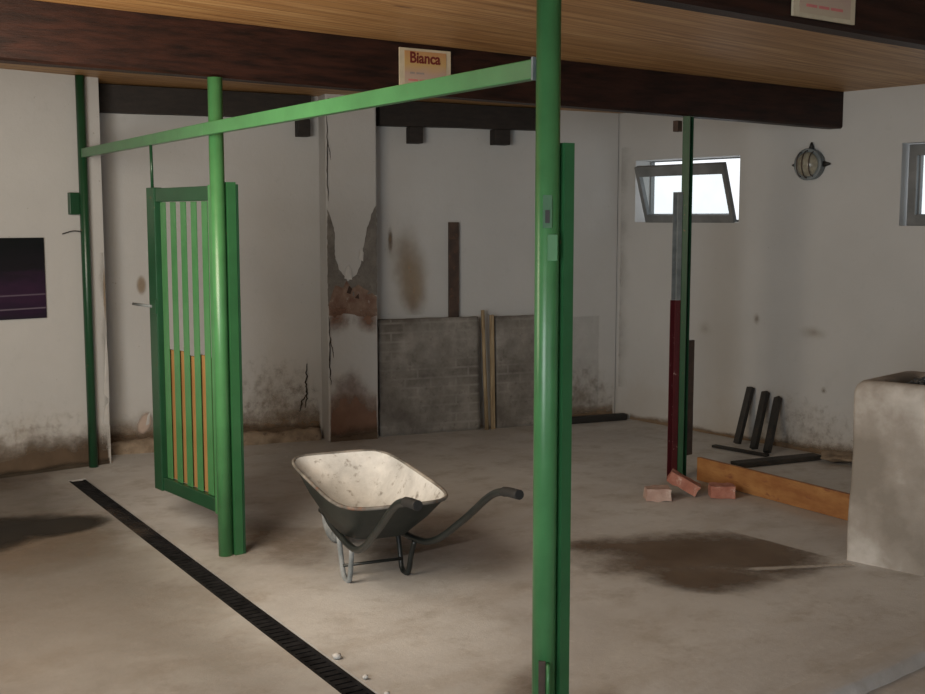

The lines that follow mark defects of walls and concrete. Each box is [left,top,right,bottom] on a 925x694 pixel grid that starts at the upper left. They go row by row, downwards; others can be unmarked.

flaking render [327,206,377,327]
damp [243,412,320,432]
damp [331,386,378,442]
damp [0,426,154,478]
damp [570,534,853,591]